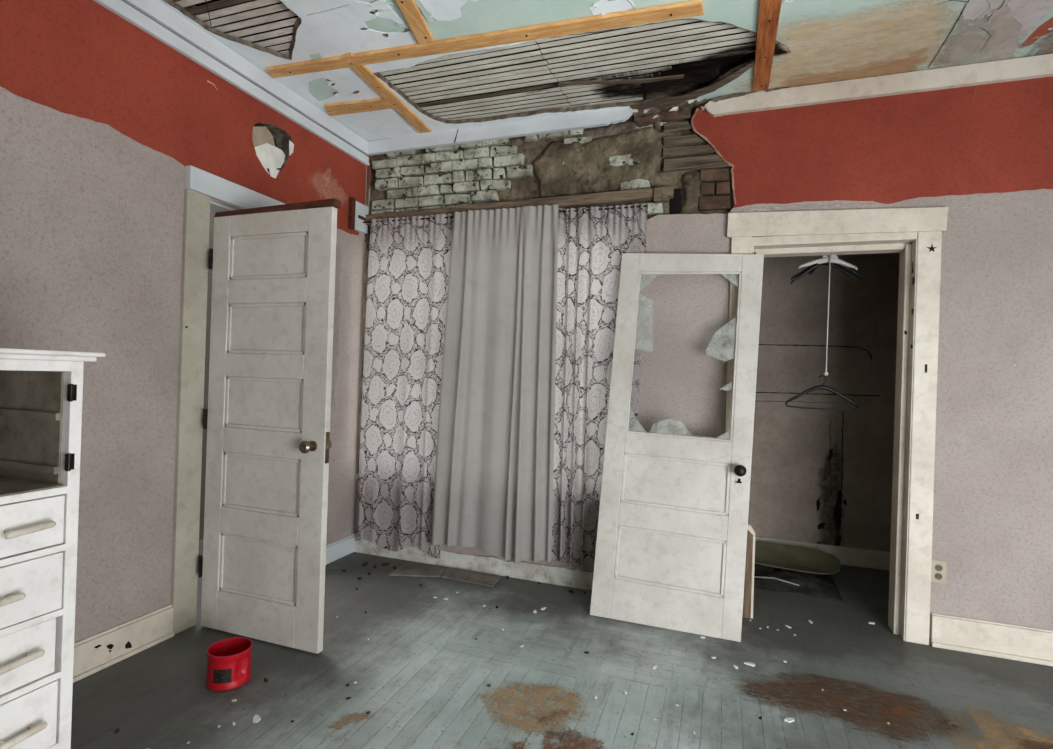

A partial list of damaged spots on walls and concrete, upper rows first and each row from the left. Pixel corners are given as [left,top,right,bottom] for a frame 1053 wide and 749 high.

damp [745,0,1053,92]
crack [928,0,1005,68]
peeling [962,0,1053,48]
spalling [159,0,791,215]